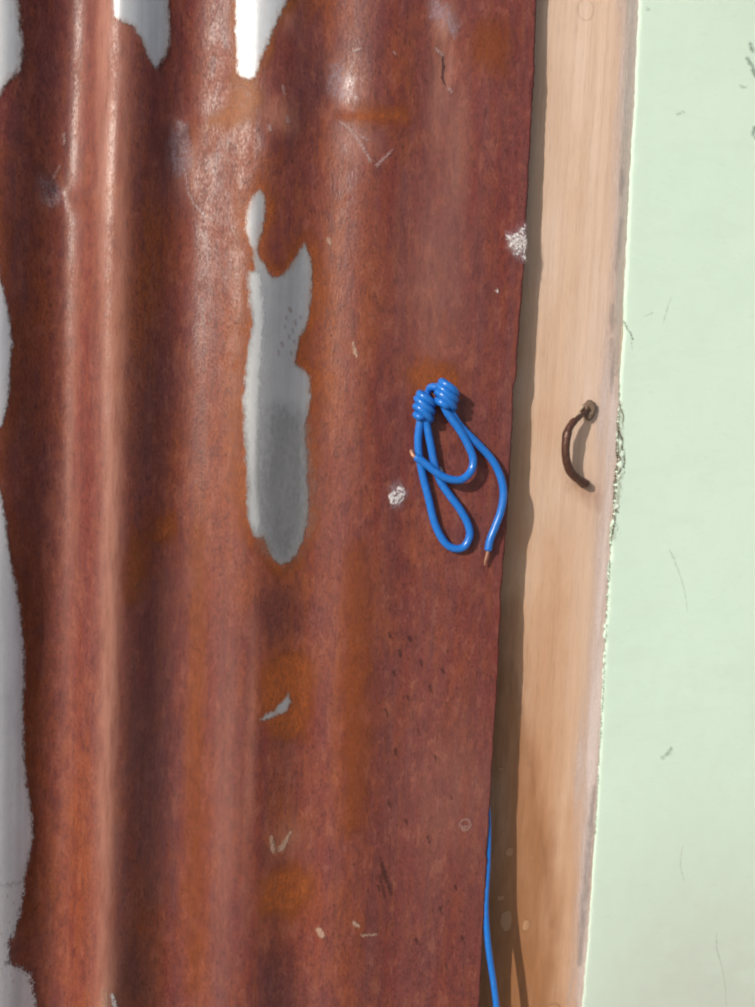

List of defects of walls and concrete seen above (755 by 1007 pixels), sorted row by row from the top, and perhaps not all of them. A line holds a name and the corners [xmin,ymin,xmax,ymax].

peeling [0,0,24,95]
peeling [111,0,171,69]
rust [208,0,274,127]
peeling [234,0,286,79]
peeling [0,283,13,427]
peeling [242,189,313,565]
rust [235,177,323,573]
rust [414,360,458,399]
peeling [0,491,37,1007]
rust [14,581,35,818]
rust [262,653,312,740]